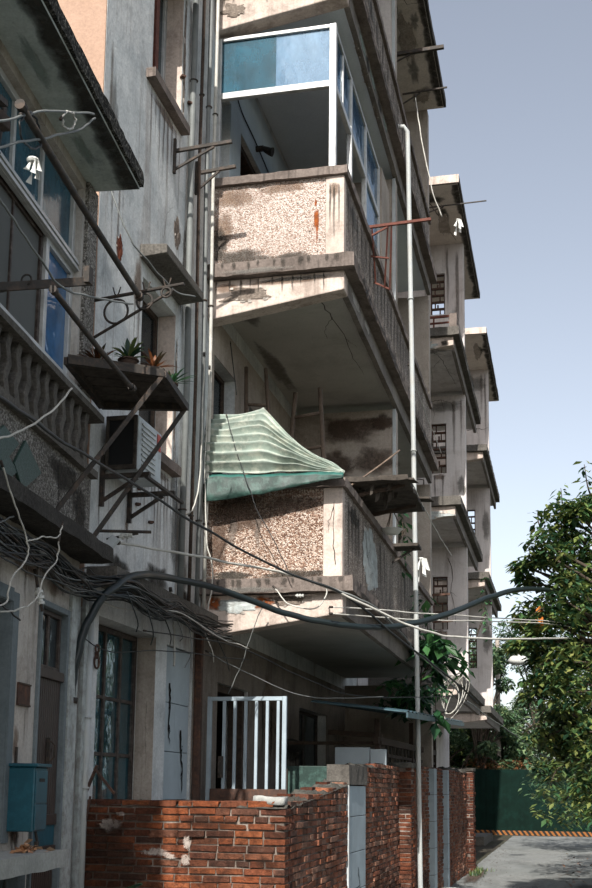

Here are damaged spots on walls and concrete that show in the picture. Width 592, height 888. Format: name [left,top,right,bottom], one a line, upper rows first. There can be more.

peeling [220,3,246,17]
leakage [360,0,406,154]
leakage [412,0,443,107]
leakage [270,184,300,192]
leakage [207,219,325,292]
peeling [218,286,272,303]
peeling [362,525,378,591]
peeling [209,598,256,614]
crack [168,683,183,792]